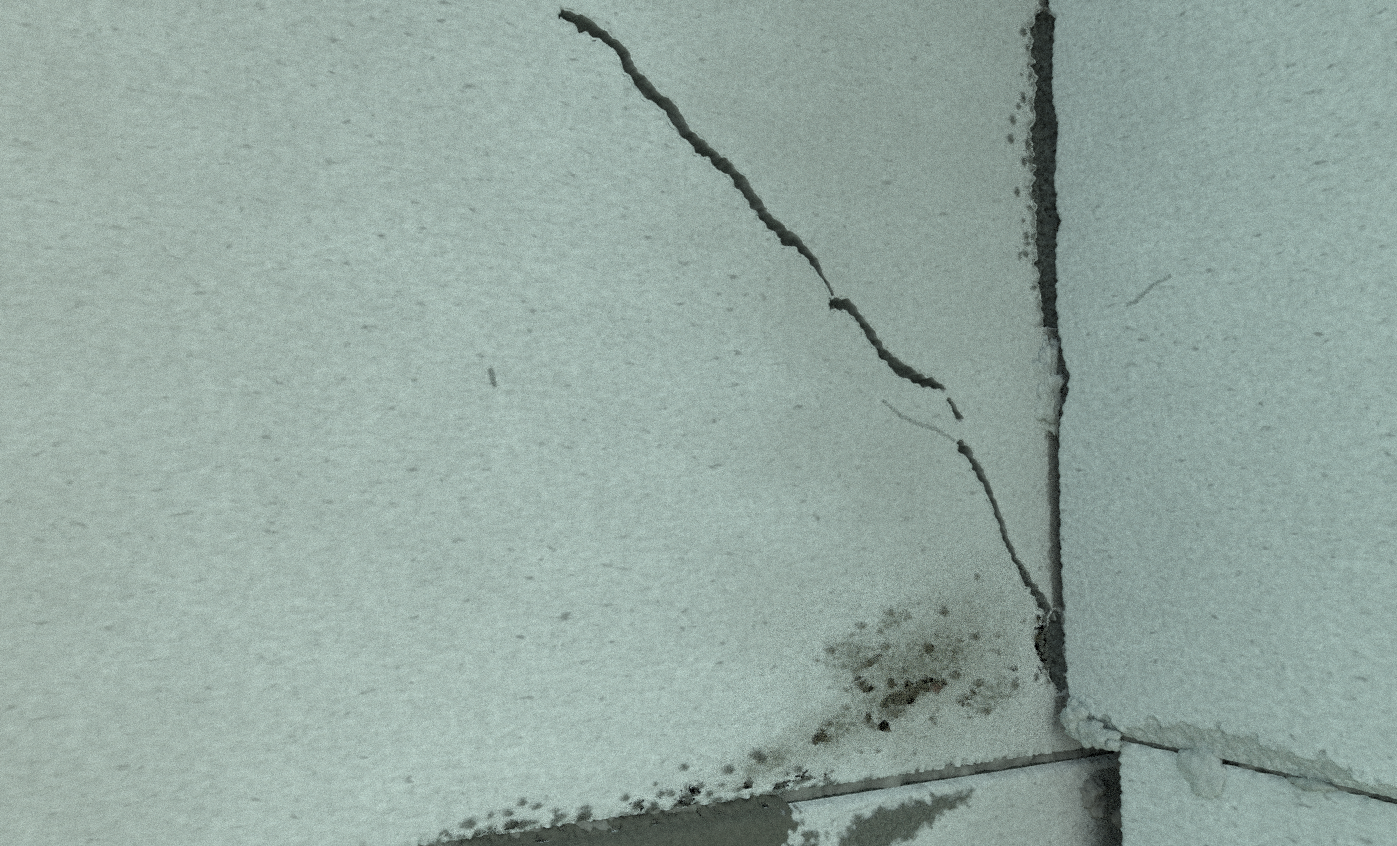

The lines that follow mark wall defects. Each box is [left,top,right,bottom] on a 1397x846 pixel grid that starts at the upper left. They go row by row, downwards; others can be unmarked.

crack [558,8,1056,622]
leakage [815,631,978,742]